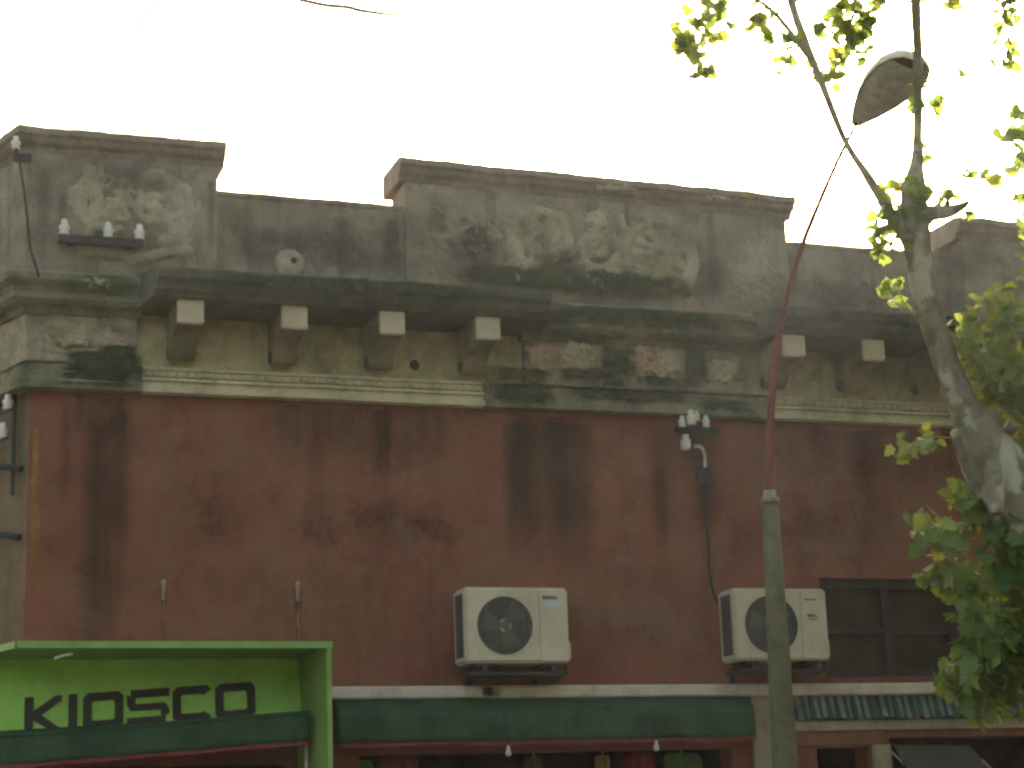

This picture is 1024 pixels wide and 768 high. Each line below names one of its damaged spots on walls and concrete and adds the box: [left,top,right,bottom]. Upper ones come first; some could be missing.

spalling [524,340,599,374]
spalling [629,344,682,378]